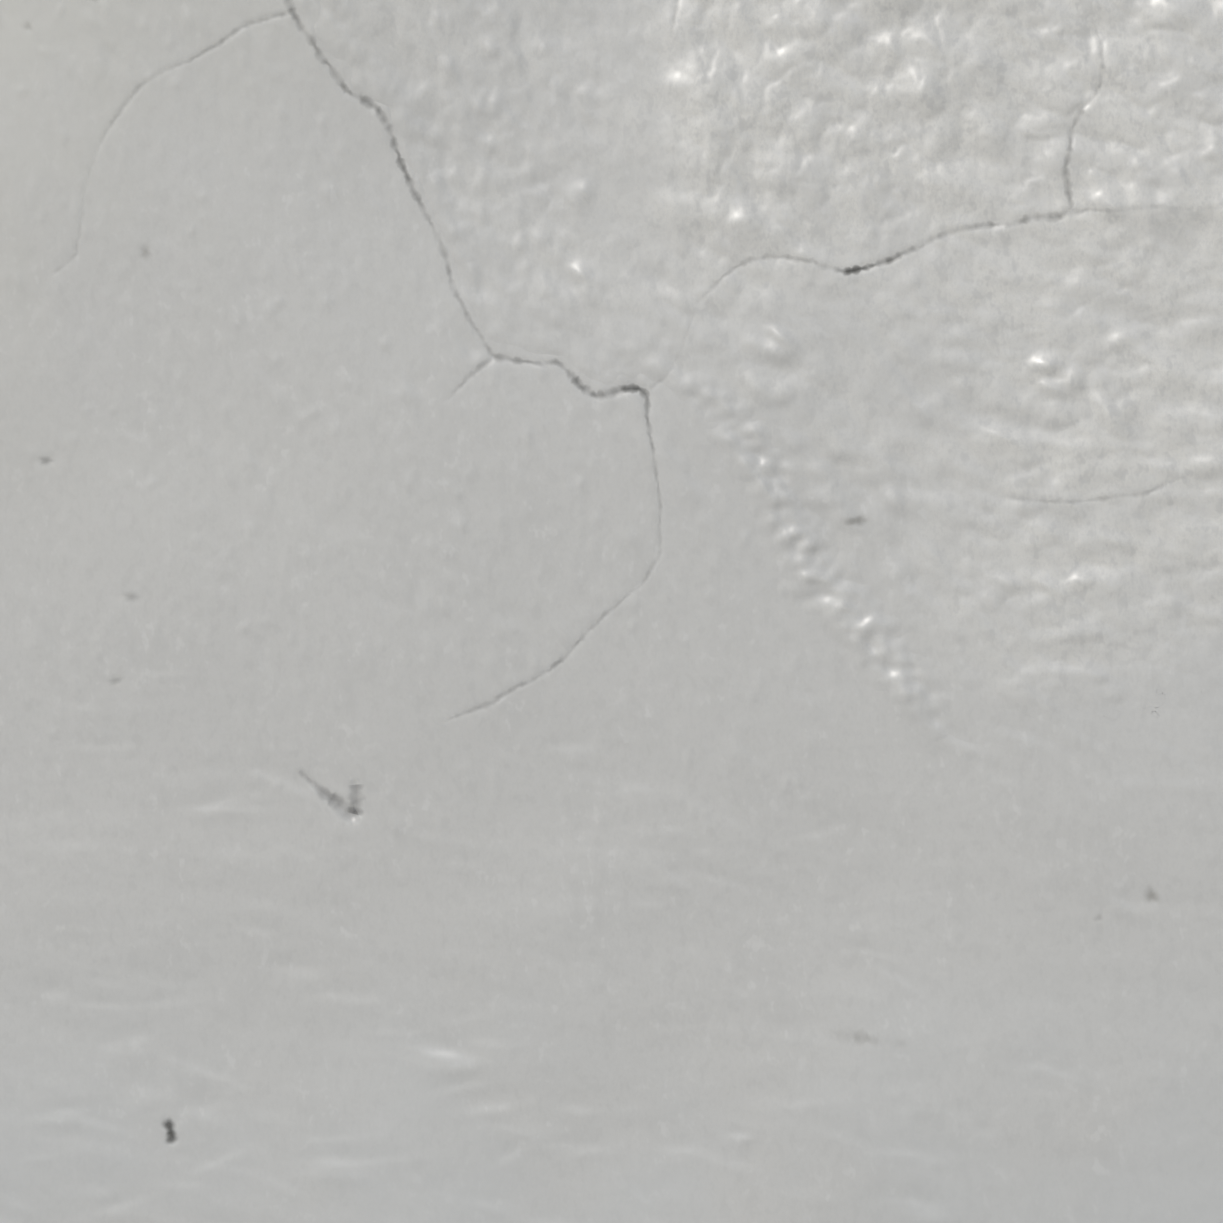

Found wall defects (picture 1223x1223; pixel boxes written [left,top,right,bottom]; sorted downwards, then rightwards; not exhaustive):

crack [845,260,890,273]